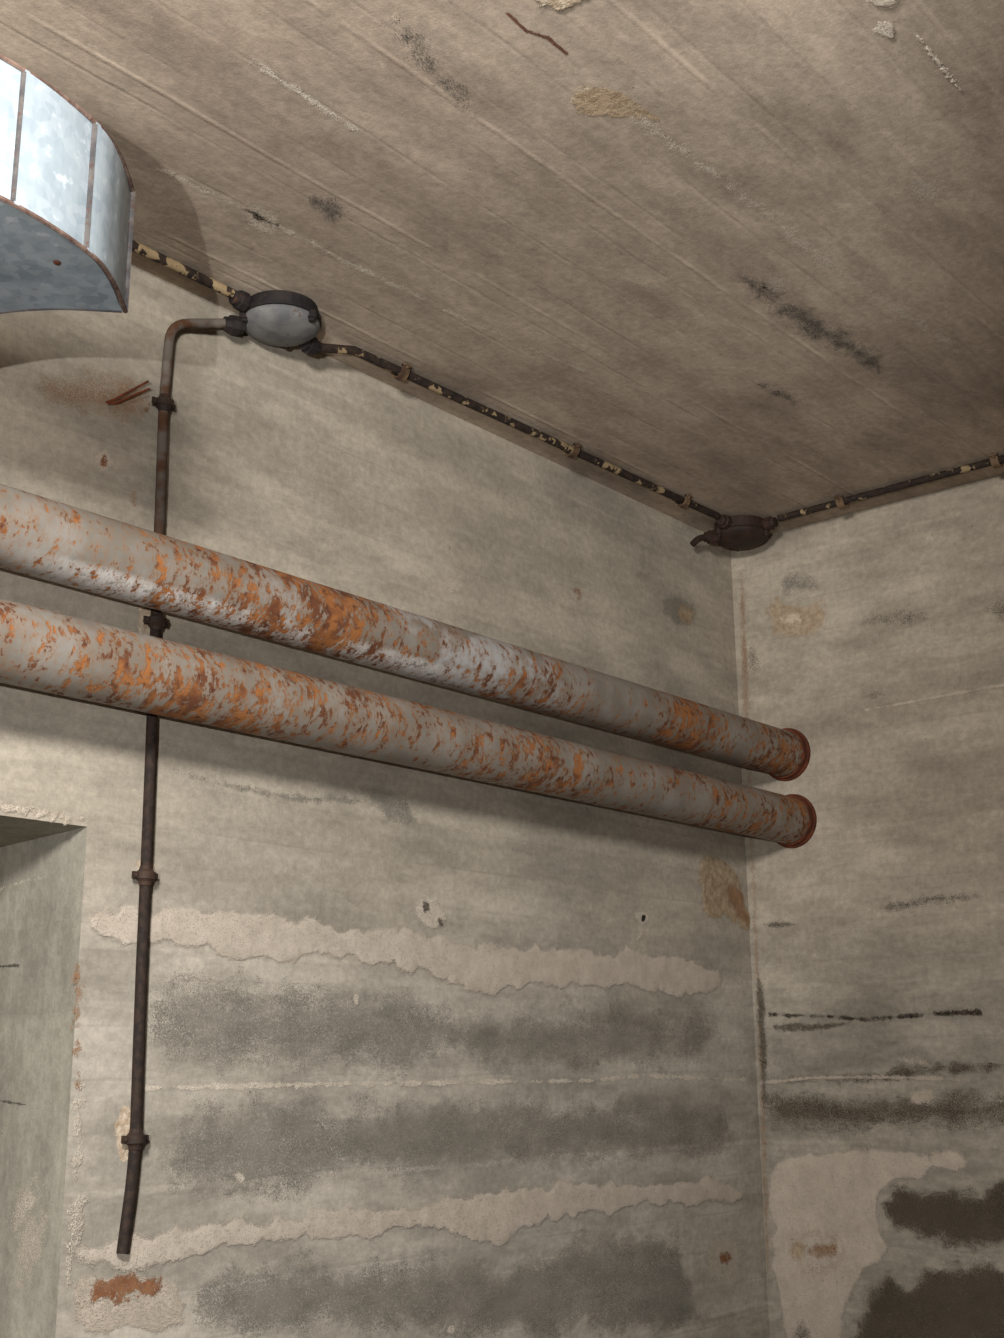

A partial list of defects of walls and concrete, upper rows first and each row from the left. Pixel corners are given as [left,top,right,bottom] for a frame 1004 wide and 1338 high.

spalling [536,0,583,11]
spalling [570,84,661,122]
damp [415,895,447,929]
damp [143,963,746,1208]
damp [763,1085,1004,1140]
damp [182,1224,710,1338]
damp [851,1180,1004,1338]